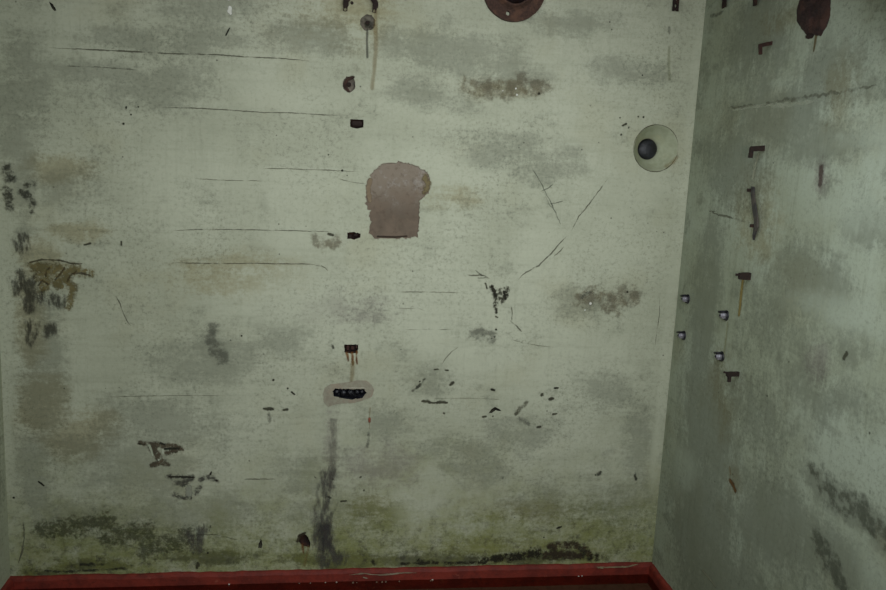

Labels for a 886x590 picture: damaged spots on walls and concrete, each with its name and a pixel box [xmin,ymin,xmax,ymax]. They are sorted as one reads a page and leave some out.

flaking render [365,161,431,239]
mould [35,511,211,569]
damp [313,470,347,569]
mould [400,541,599,565]